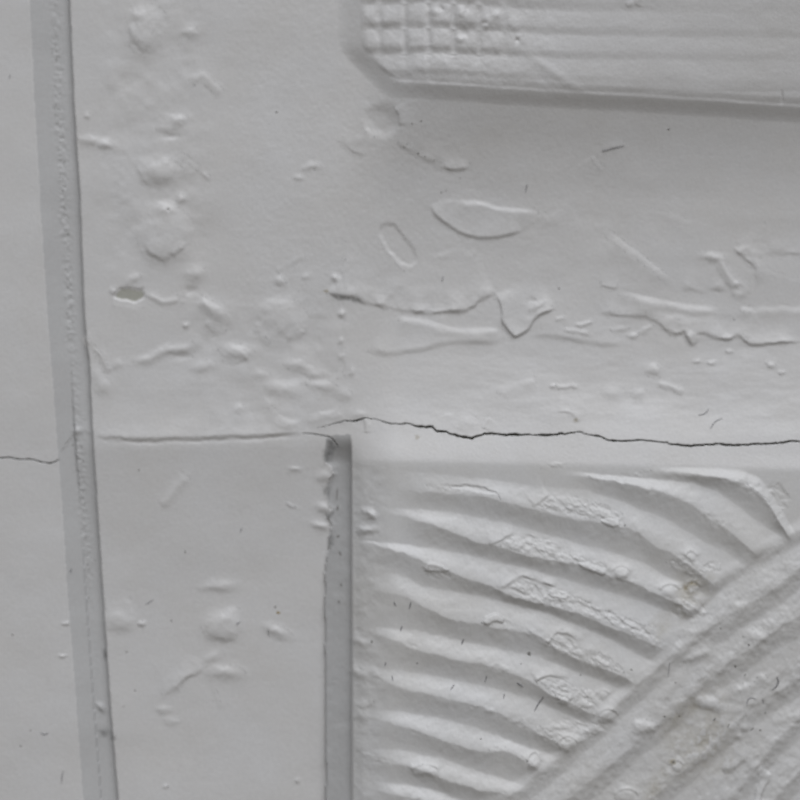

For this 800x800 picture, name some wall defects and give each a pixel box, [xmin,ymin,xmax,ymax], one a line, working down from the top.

peeling [109,274,145,310]
peeling [327,282,800,358]
crack [0,433,75,465]
crack [95,417,800,448]